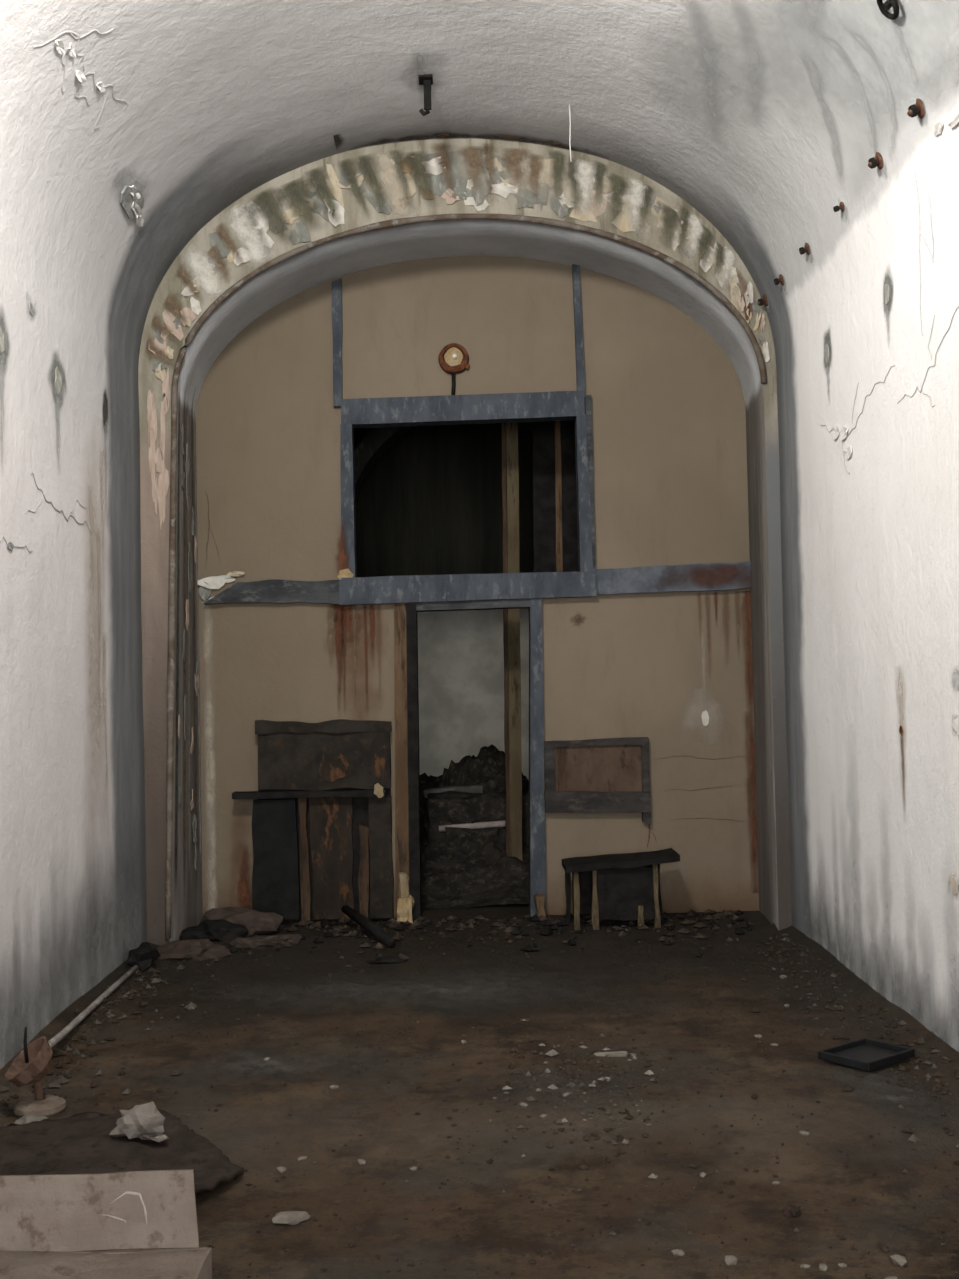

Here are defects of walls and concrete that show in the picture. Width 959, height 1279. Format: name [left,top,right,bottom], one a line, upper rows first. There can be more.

leakage [786,0,959,173]
spalling [115,172,144,227]
crack [826,170,959,475]
crack [0,536,33,552]
crack [25,472,101,542]
peeling [147,148,770,754]
rust [328,604,380,700]
rust [689,565,758,893]
leakage [0,874,140,1069]
leakage [805,908,959,1052]
leakage [832,1069,937,1115]